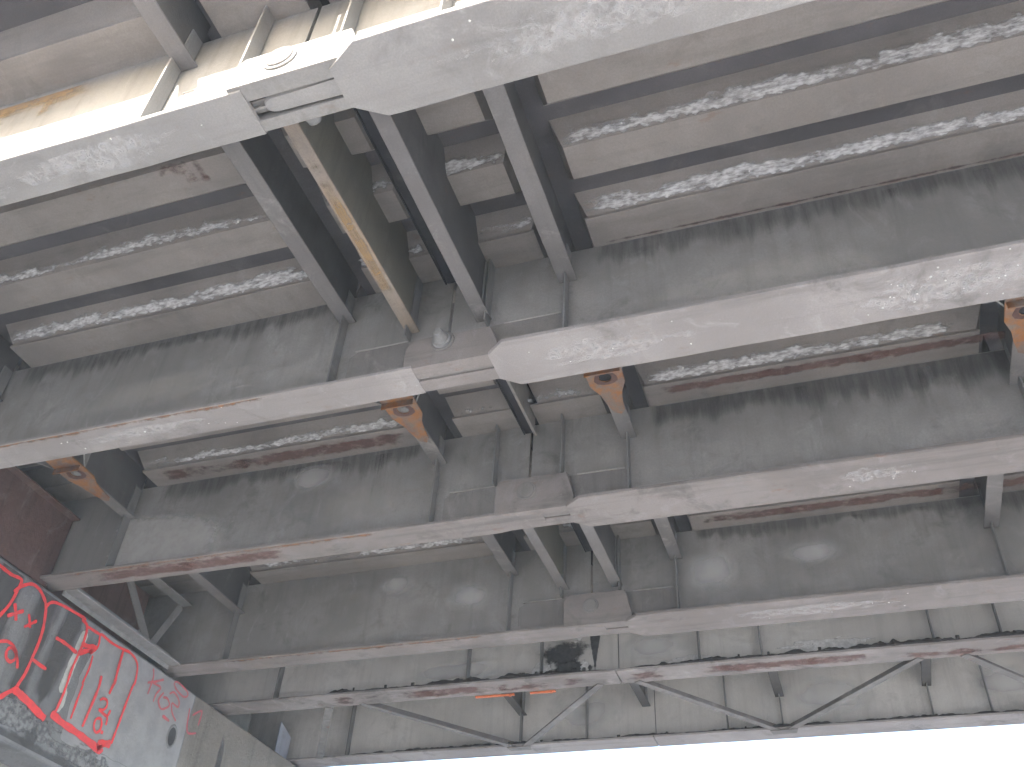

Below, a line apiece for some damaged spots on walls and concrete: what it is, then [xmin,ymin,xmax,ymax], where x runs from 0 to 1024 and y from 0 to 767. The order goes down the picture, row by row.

efflorescence [566,13,1024,142]
leakage [595,107,1024,210]
efflorescence [72,217,257,265]
rust [333,202,388,289]
leakage [14,268,307,340]
efflorescence [649,323,947,381]
rust [668,332,1005,392]
leakage [156,419,399,463]
rust [229,434,396,468]
rust [705,488,941,522]
rust [76,534,371,581]
rust [711,655,865,672]